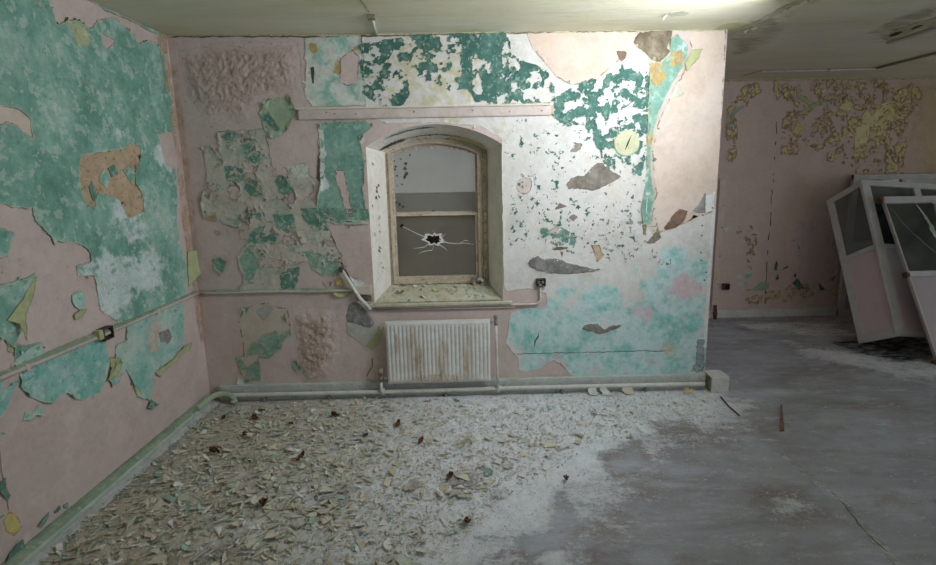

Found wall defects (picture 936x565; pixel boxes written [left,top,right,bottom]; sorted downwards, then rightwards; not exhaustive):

crack [169,30,652,38]
crack [741,0,809,30]
peeling [0,0,201,420]
peeling [200,11,923,396]
crack [402,226,474,253]
peeling [0,512,26,563]